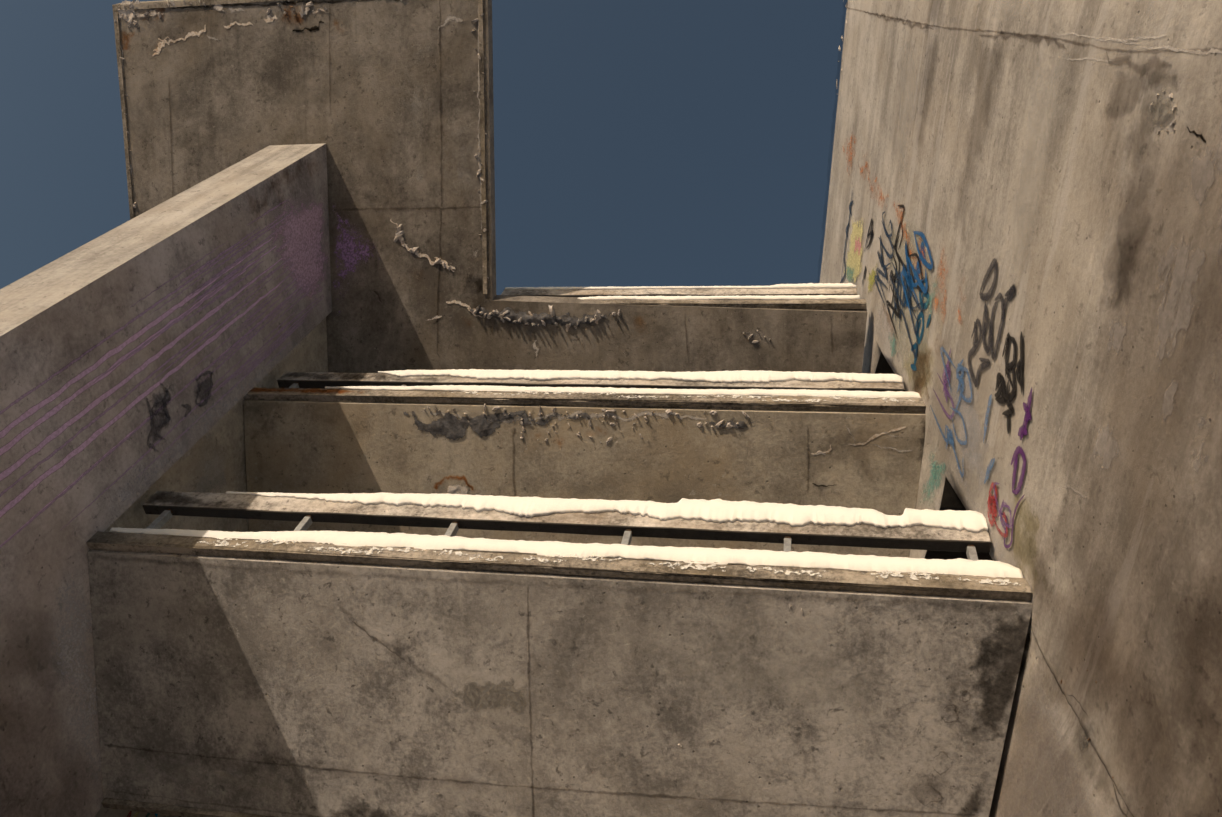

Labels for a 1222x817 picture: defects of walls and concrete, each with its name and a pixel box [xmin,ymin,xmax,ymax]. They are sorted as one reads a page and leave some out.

crack [1038,32,1222,65]
spalling [469,305,620,332]
peeling [403,404,753,444]
rust [445,485,468,494]
damp [978,623,1029,724]